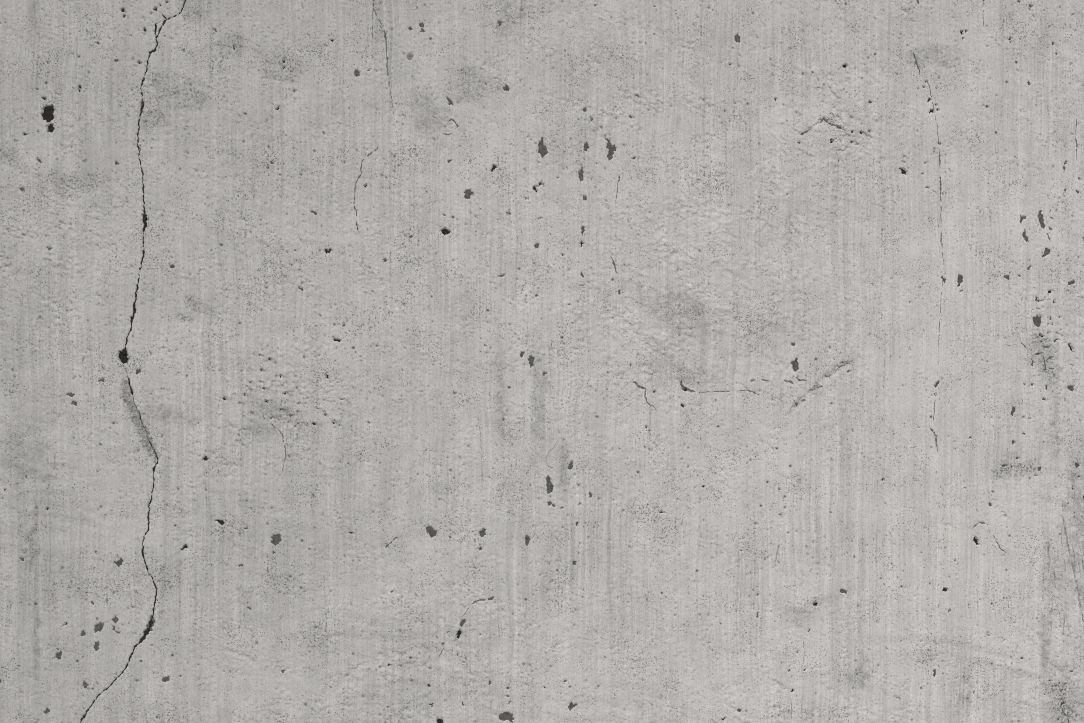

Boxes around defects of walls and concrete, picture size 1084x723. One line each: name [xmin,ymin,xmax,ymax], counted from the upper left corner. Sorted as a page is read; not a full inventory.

crack [80,0,186,723]